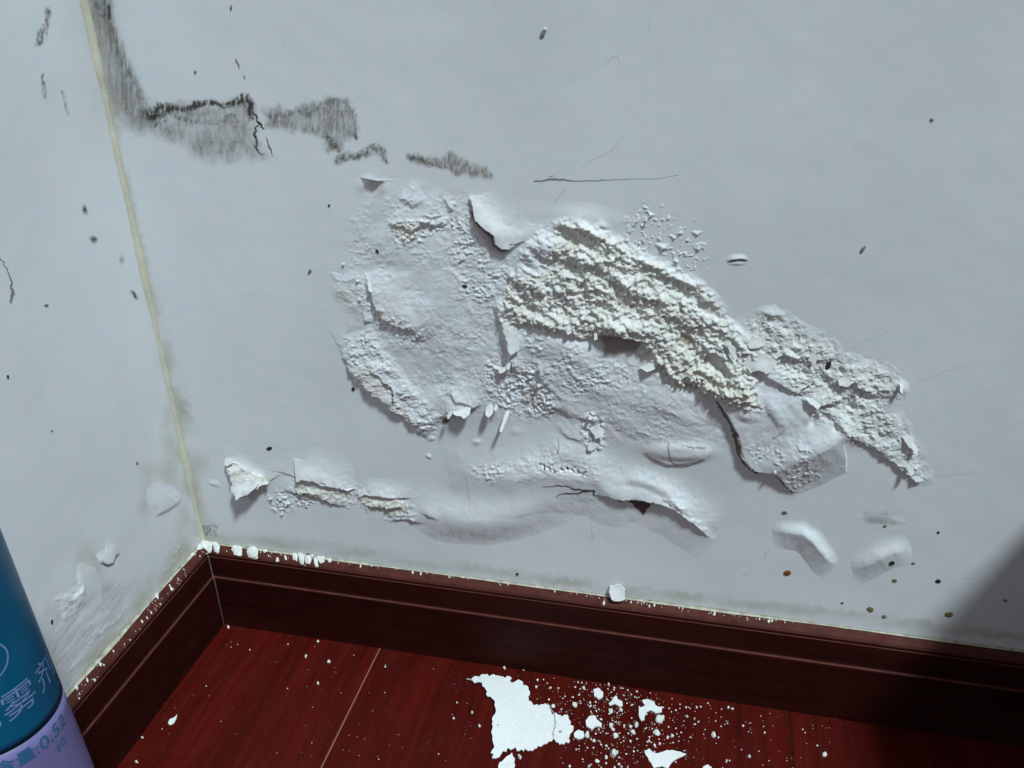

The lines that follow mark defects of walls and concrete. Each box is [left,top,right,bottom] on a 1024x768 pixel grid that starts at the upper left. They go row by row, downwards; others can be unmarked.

leakage [93,0,253,127]
leakage [303,99,387,163]
peeling [331,177,398,208]
leakage [410,153,491,177]
flaking render [458,181,935,486]
peeling [207,443,417,527]
crack [547,485,595,497]
peeling [48,540,120,626]